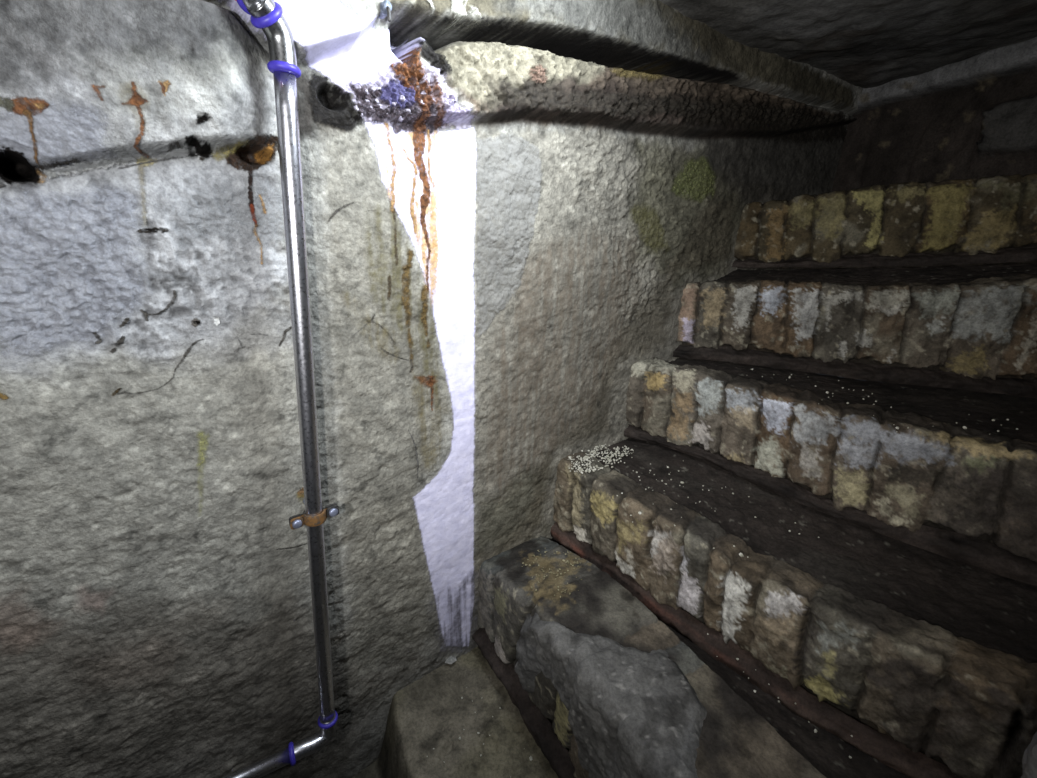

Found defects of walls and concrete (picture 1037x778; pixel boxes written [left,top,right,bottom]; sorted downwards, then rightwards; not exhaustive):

rust [0,96,49,165]
crack [33,157,81,170]
rust [122,82,149,159]
crack [119,154,213,169]
rust [349,48,470,299]
rust [415,376,436,411]